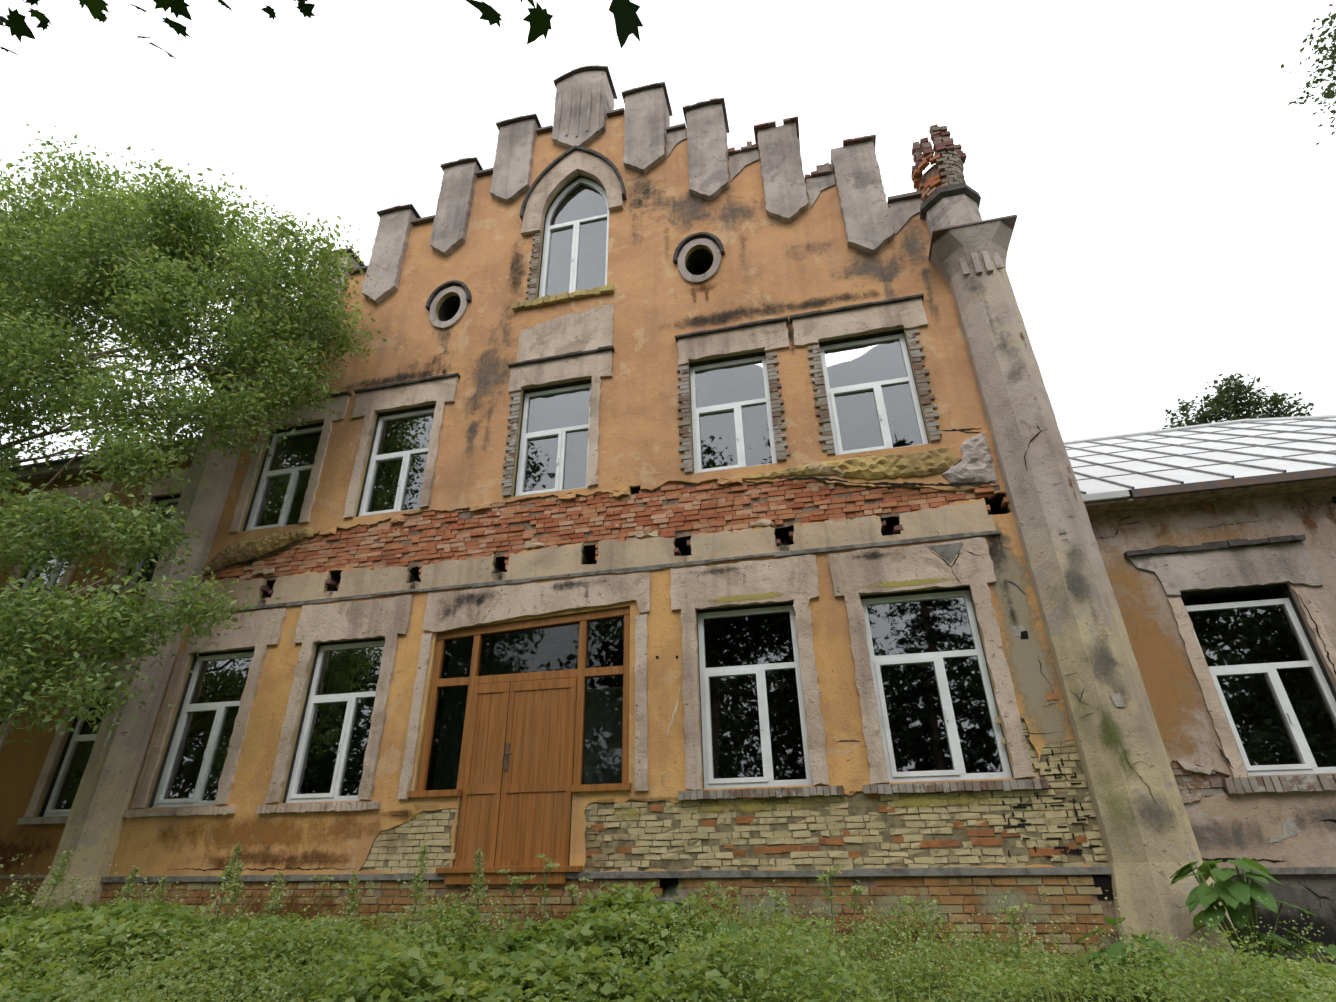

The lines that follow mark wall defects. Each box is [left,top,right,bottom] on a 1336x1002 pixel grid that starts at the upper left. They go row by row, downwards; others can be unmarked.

damp [677,228,931,367]
spalling [203,352,1001,582]
flaking render [807,345,835,455]
peeling [583,534,1108,872]
crack [1024,660,1092,734]
peeling [1107,558,1229,798]
crack [1120,742,1161,809]
damp [1238,908,1336,963]